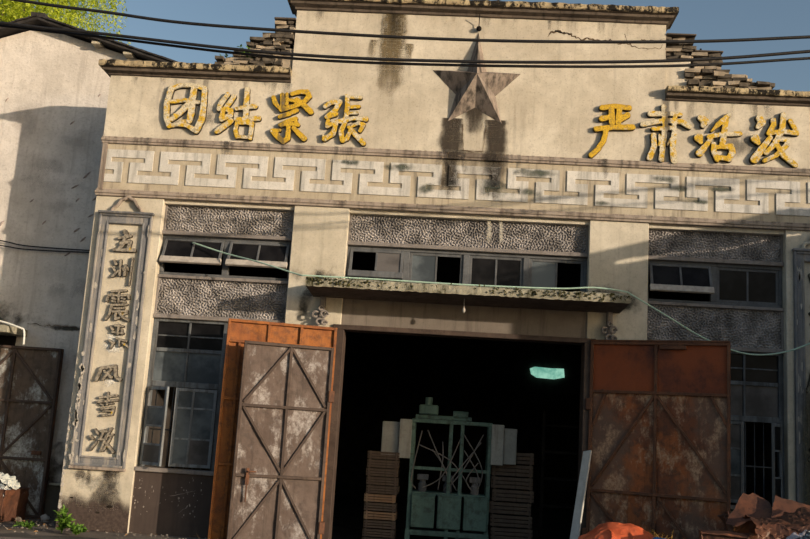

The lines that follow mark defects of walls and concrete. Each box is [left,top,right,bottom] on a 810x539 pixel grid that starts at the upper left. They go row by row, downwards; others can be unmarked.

water stain [370,14,413,86]
crack [548,30,662,49]
water stain [437,108,509,196]
water stain [515,169,549,177]
water stain [55,470,130,533]